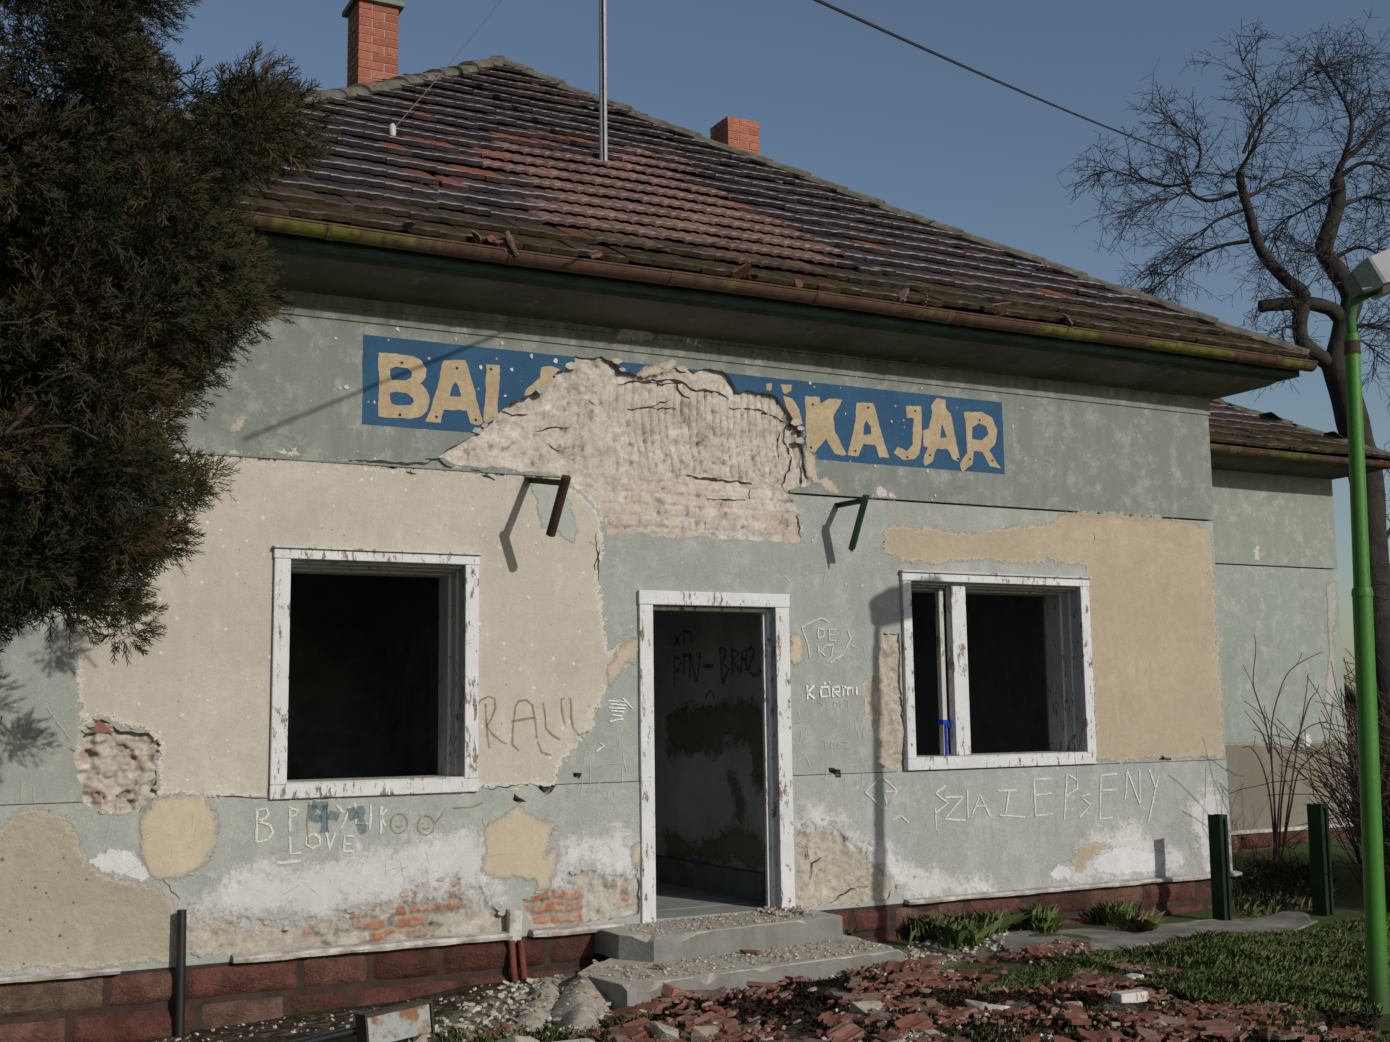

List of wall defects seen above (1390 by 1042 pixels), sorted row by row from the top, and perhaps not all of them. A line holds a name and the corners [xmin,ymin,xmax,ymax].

crack [501,379,802,537]
peeling [0,329,839,974]
spalling [862,631,907,772]
peeling [881,509,1347,831]
damp [186,814,514,935]
spalling [795,818,917,908]
efflorescence [1040,776,1229,884]